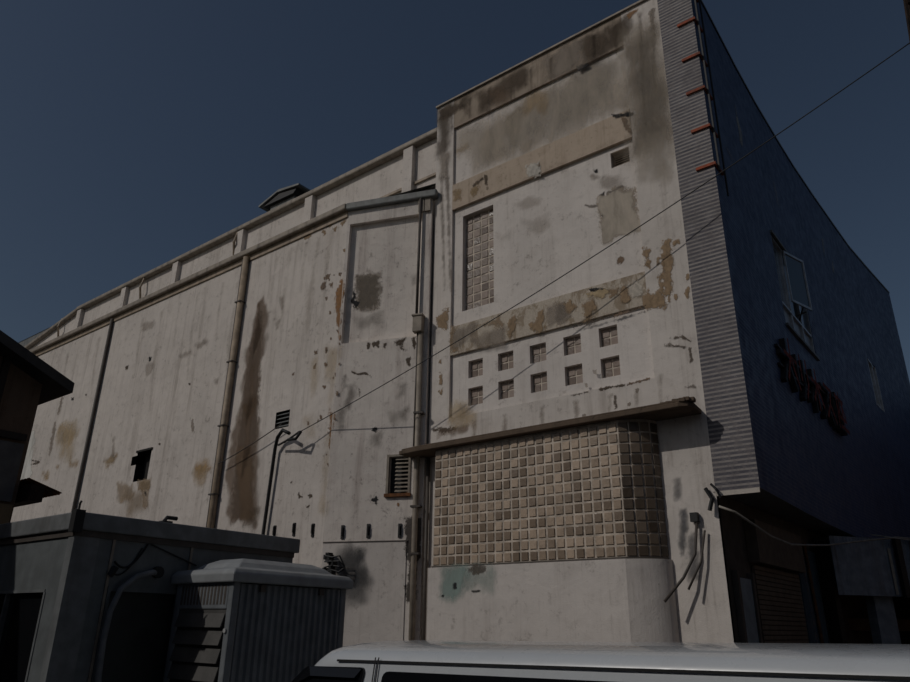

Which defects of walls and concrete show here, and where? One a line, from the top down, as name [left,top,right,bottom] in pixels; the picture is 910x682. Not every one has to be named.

leakage [438,100,464,178]
leakage [479,69,527,111]
leakage [545,16,673,140]
peeling [436,239,690,395]